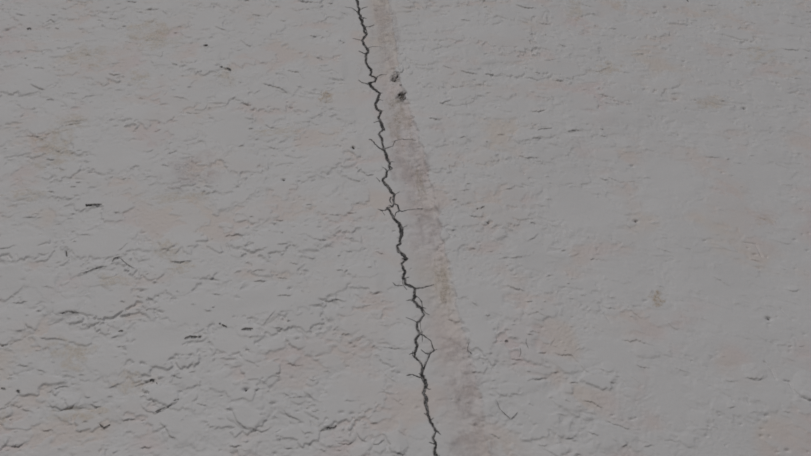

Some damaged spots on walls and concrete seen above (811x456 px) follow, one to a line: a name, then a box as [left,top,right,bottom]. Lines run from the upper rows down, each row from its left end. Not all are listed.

crack [349,0,441,456]